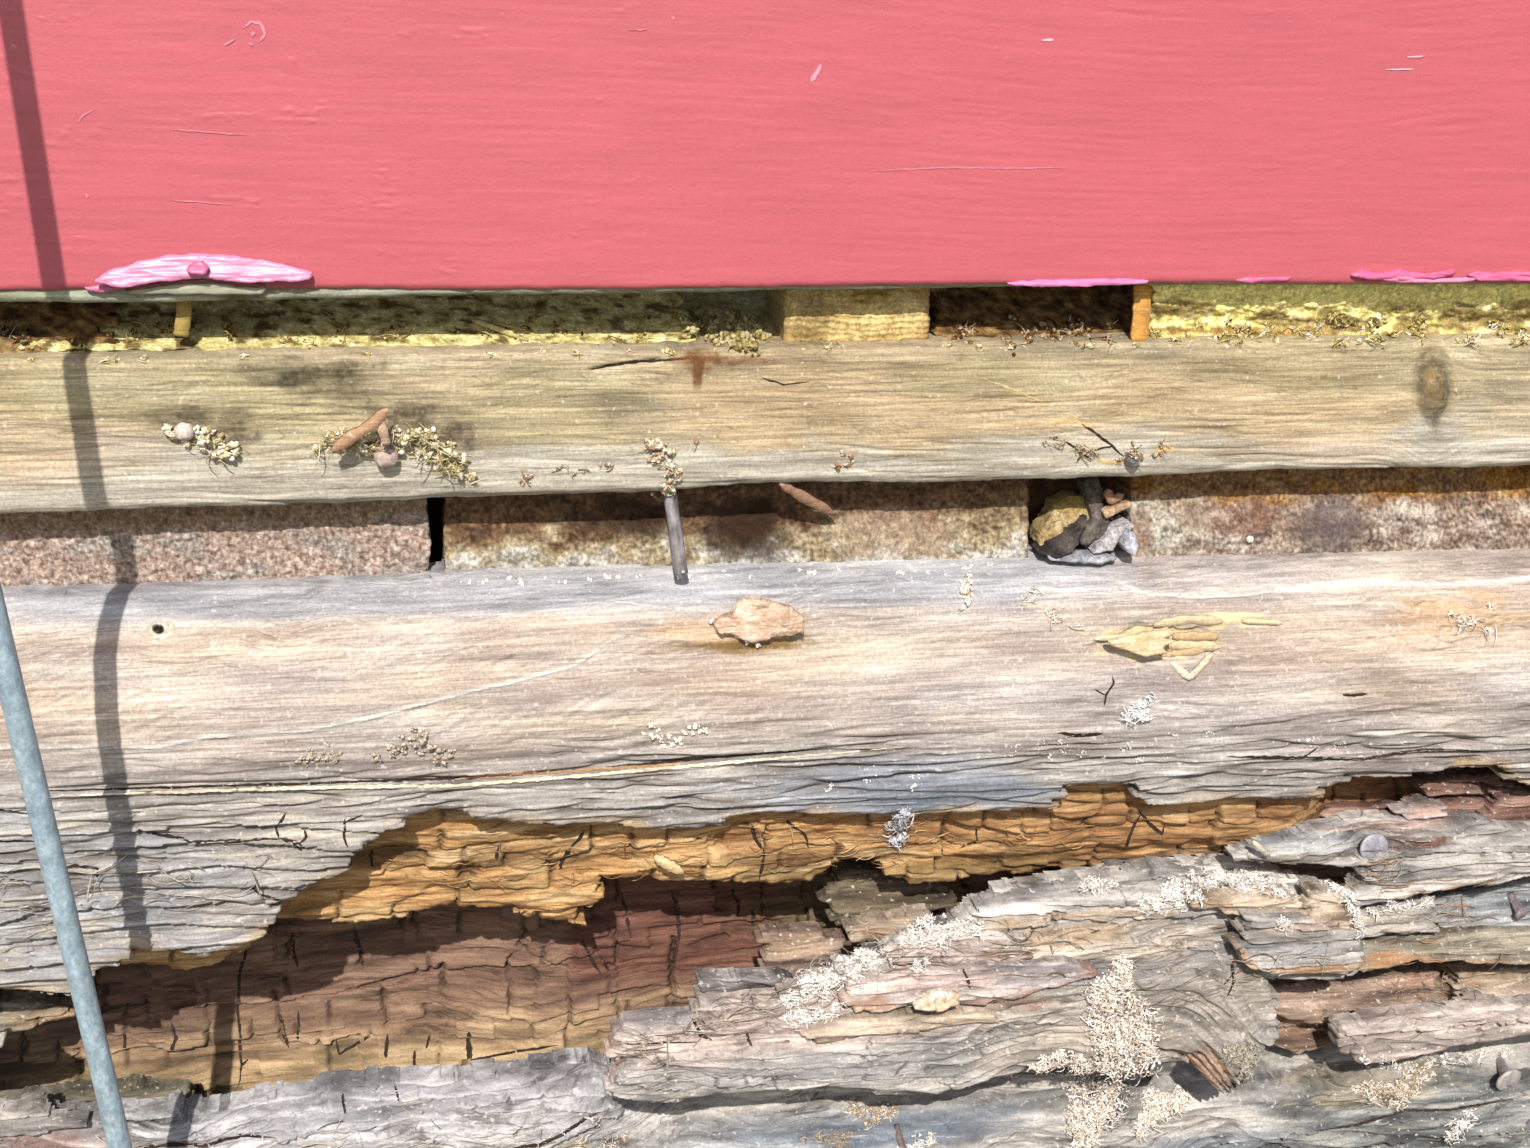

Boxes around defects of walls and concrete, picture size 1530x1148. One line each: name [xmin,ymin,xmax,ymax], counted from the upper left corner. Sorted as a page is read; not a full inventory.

peeling [1351,268,1530,283]
corrosion [683,350,744,384]
crack [0,747,901,870]
crack [67,864,99,878]
crack [252,887,298,967]
peeling [913,987,960,1012]
crack [170,1023,178,1051]
crack [236,949,248,1086]
crack [278,1011,300,1048]
crack [466,1032,558,1061]
crack [620,1018,752,1046]
crack [336,1034,430,1102]